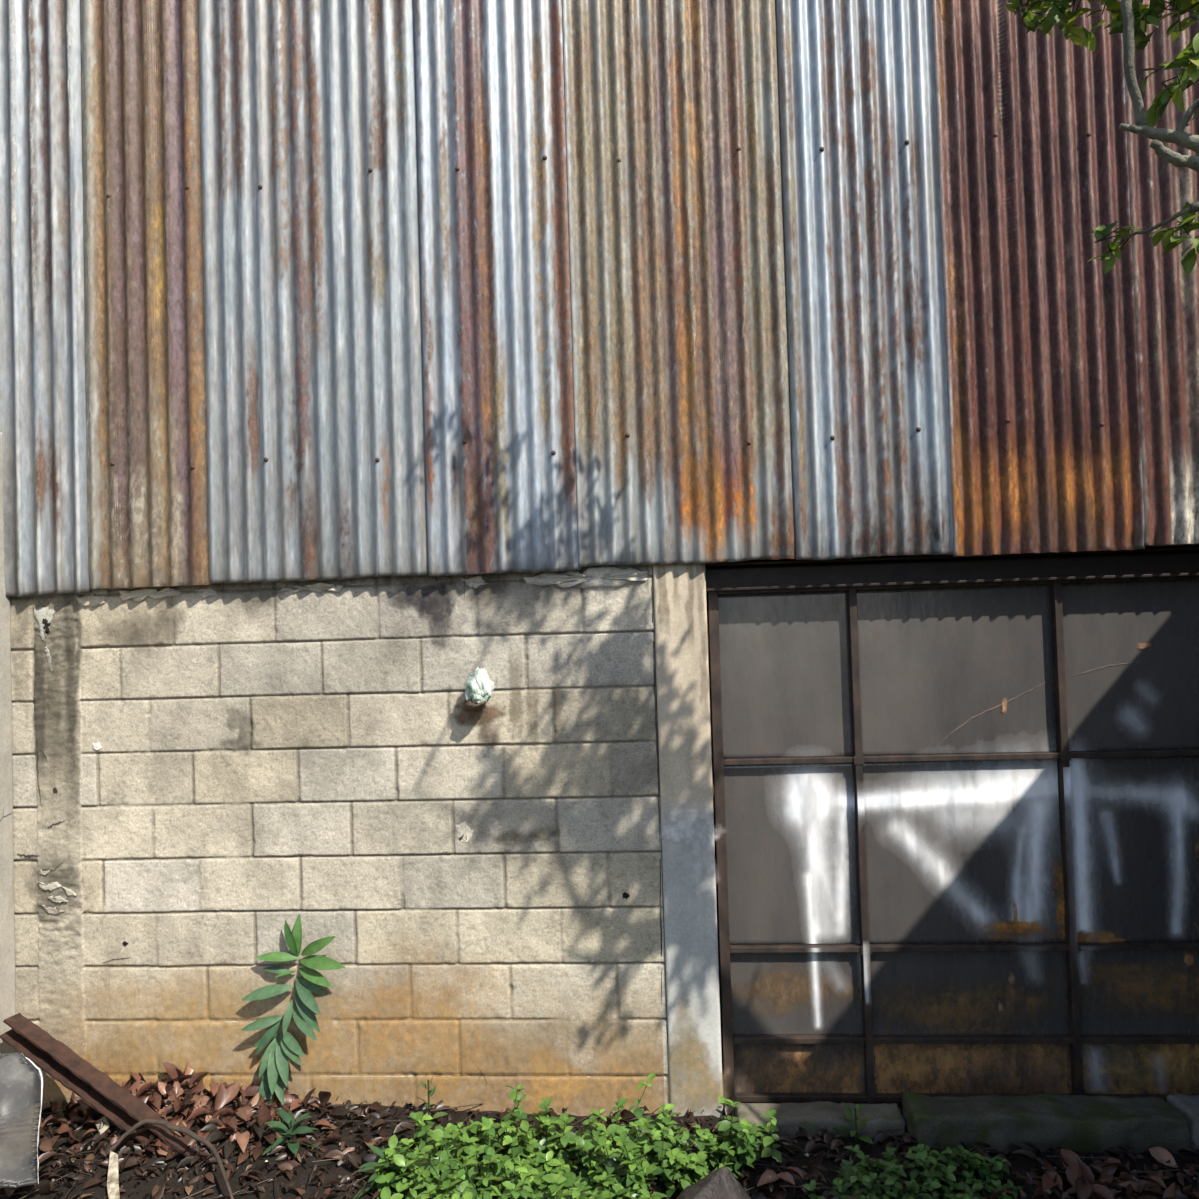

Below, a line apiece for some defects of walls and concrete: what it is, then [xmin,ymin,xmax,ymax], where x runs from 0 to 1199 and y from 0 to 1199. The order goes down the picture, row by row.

corrosion [215,0,243,194]
corrosion [26,0,209,589]
corrosion [439,0,508,574]
corrosion [531,0,806,559]
corrosion [822,0,1199,557]
peeling [34,606,56,672]
water stain [34,618,82,755]
water stain [128,578,365,605]
water stain [383,575,456,637]
water stain [36,862,74,920]
spalling [37,868,77,915]
water stain [84,988,723,1117]